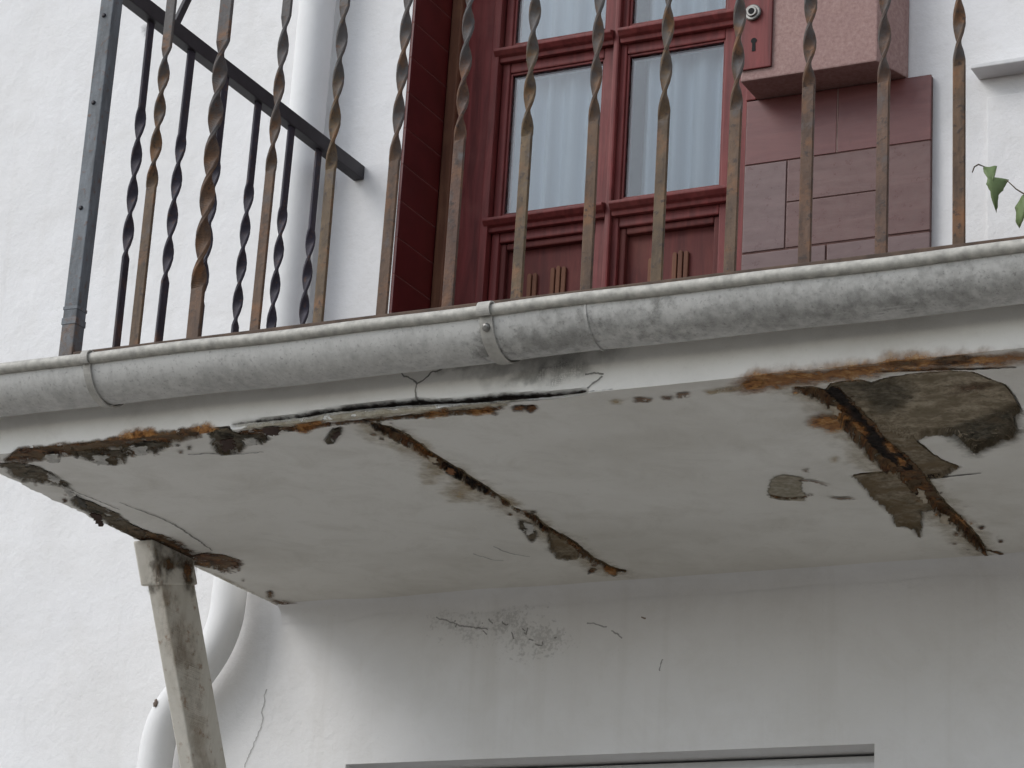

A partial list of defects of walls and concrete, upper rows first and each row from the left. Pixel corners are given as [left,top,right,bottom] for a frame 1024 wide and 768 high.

corrosion [707,353,1024,394]
corrosion [635,393,689,403]
spalling [827,370,1020,479]
spalling [0,406,436,584]
crack [234,369,626,577]
peeling [768,470,851,501]
corrosion [150,544,193,592]